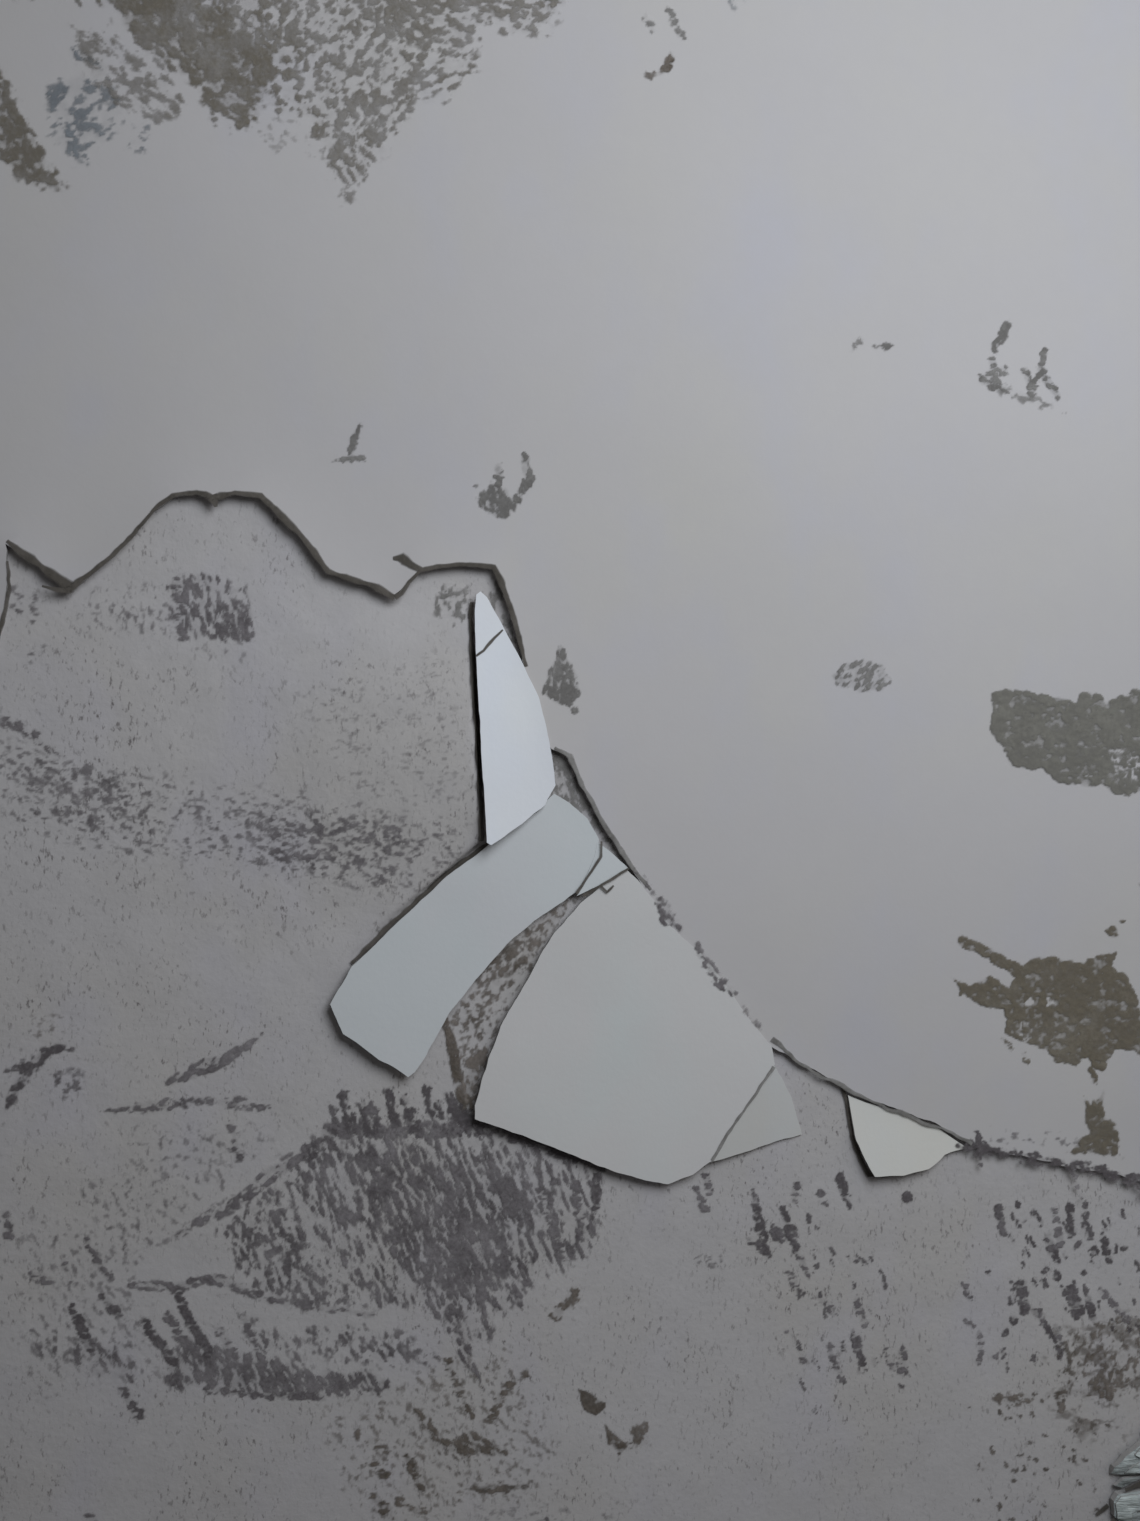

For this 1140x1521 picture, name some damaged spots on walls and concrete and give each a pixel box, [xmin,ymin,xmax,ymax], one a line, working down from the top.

peeling [0,72,59,190]
peeling [46,0,560,202]
peeling [0,495,1140,1521]